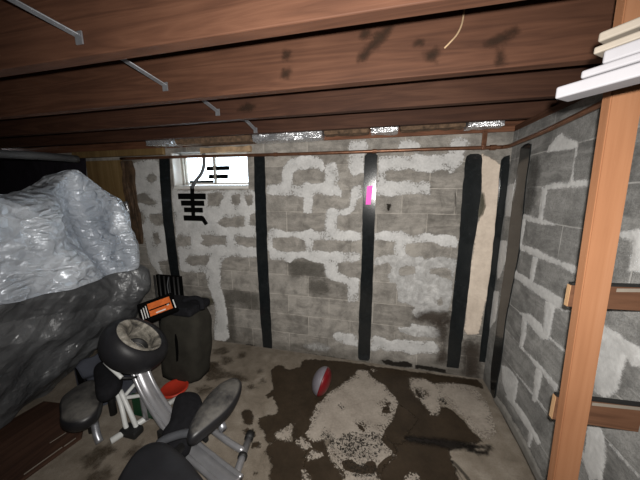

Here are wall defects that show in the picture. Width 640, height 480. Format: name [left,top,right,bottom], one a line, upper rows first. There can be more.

water stain [415,311,450,361]